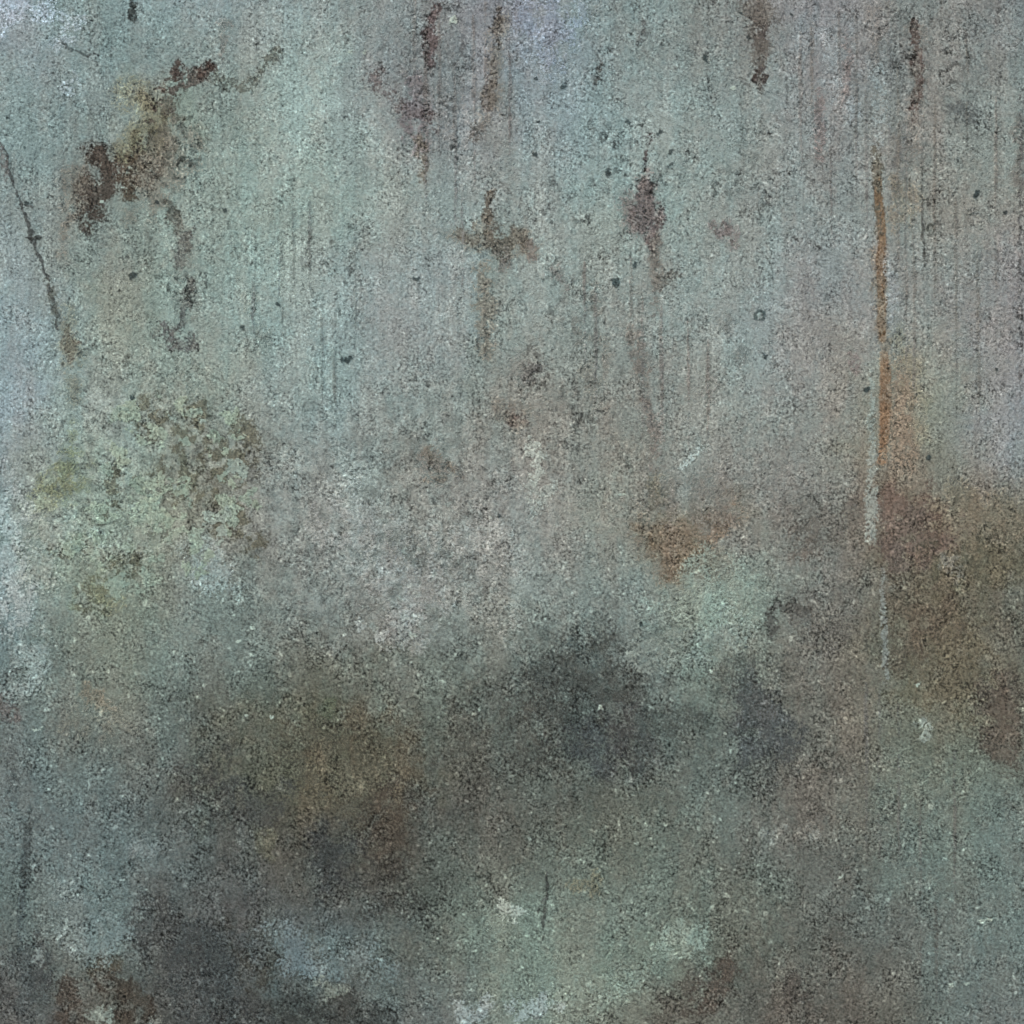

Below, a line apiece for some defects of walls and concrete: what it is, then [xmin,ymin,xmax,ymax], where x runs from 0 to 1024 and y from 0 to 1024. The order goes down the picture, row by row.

crack [0,142,60,330]
corrosion [72,46,283,235]
corrosion [368,2,442,183]
corrosion [457,189,540,360]
corrosion [628,133,682,316]
corrosion [736,0,775,90]
corrosion [870,142,922,467]
leakage [765,596,813,639]
leakage [514,625,712,784]
leakage [727,663,809,769]
leakage [118,892,399,1024]
leakage [454,991,565,1024]